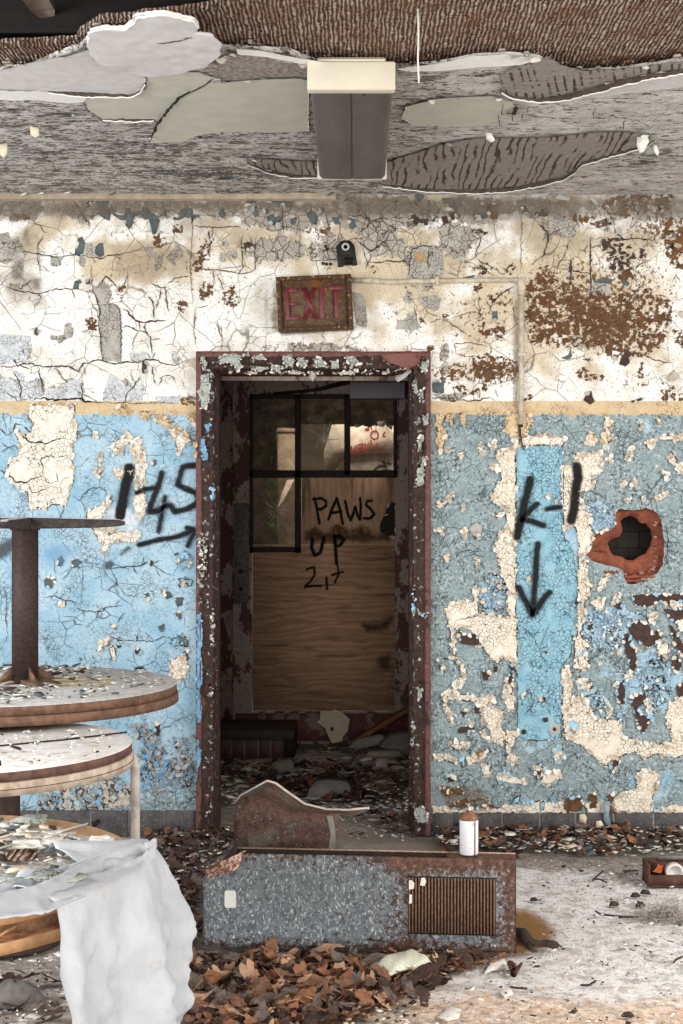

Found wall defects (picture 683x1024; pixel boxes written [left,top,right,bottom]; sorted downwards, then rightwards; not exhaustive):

spalling [0,0,683,239]
crack [278,194,444,277]
peeling [5,379,78,511]
crack [0,209,258,518]
peeling [115,345,444,462]
rust [576,367,608,381]
rust [525,265,683,378]
rust [660,385,683,401]
crack [515,445,578,609]
peeling [0,531,215,724]
peeling [221,411,683,856]
crack [517,626,577,758]